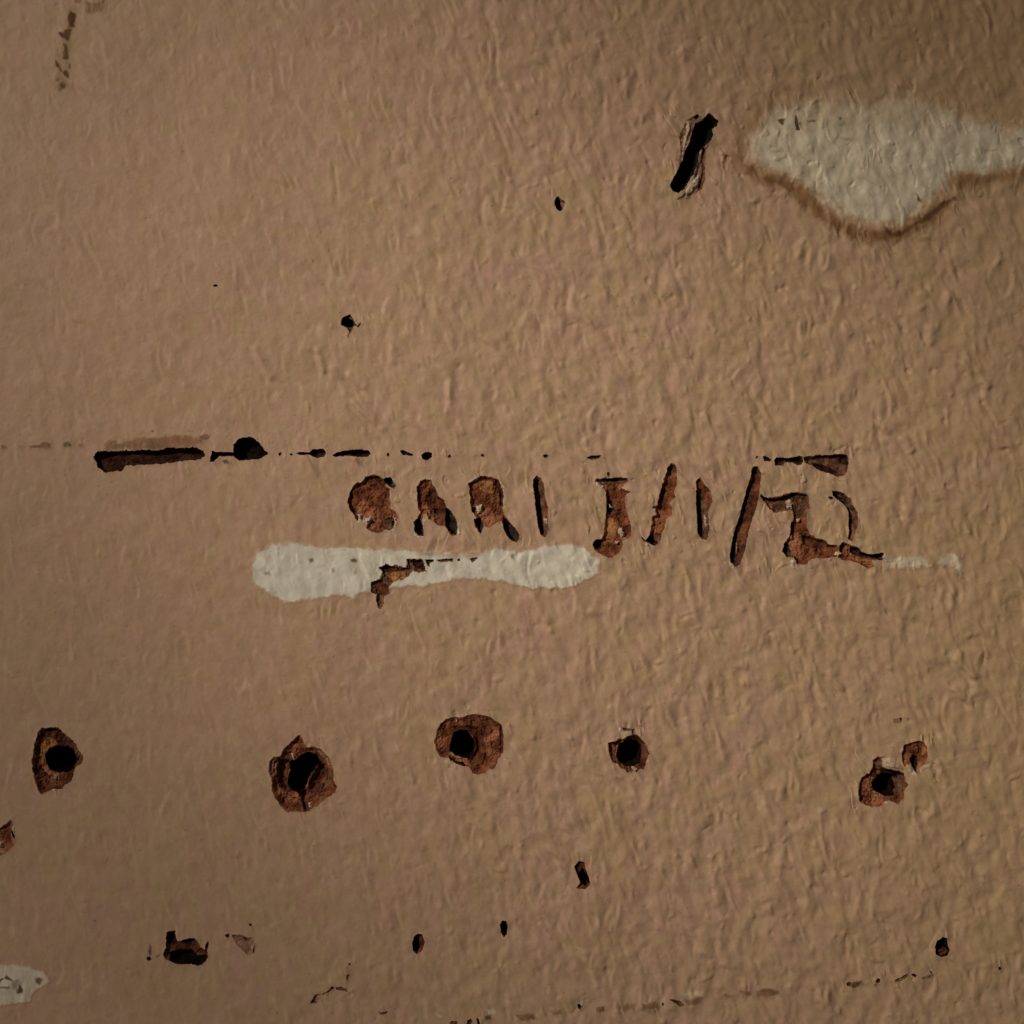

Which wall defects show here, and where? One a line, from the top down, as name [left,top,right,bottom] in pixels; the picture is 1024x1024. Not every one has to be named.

spalling [670,113,718,200]
damp [715,69,1024,252]
spalling [371,557,478,609]
spalling [31,727,83,794]
spalling [268,735,337,812]
spalling [433,714,504,775]
spalling [606,727,650,773]
spalling [858,741,941,807]
spalling [147,930,209,966]